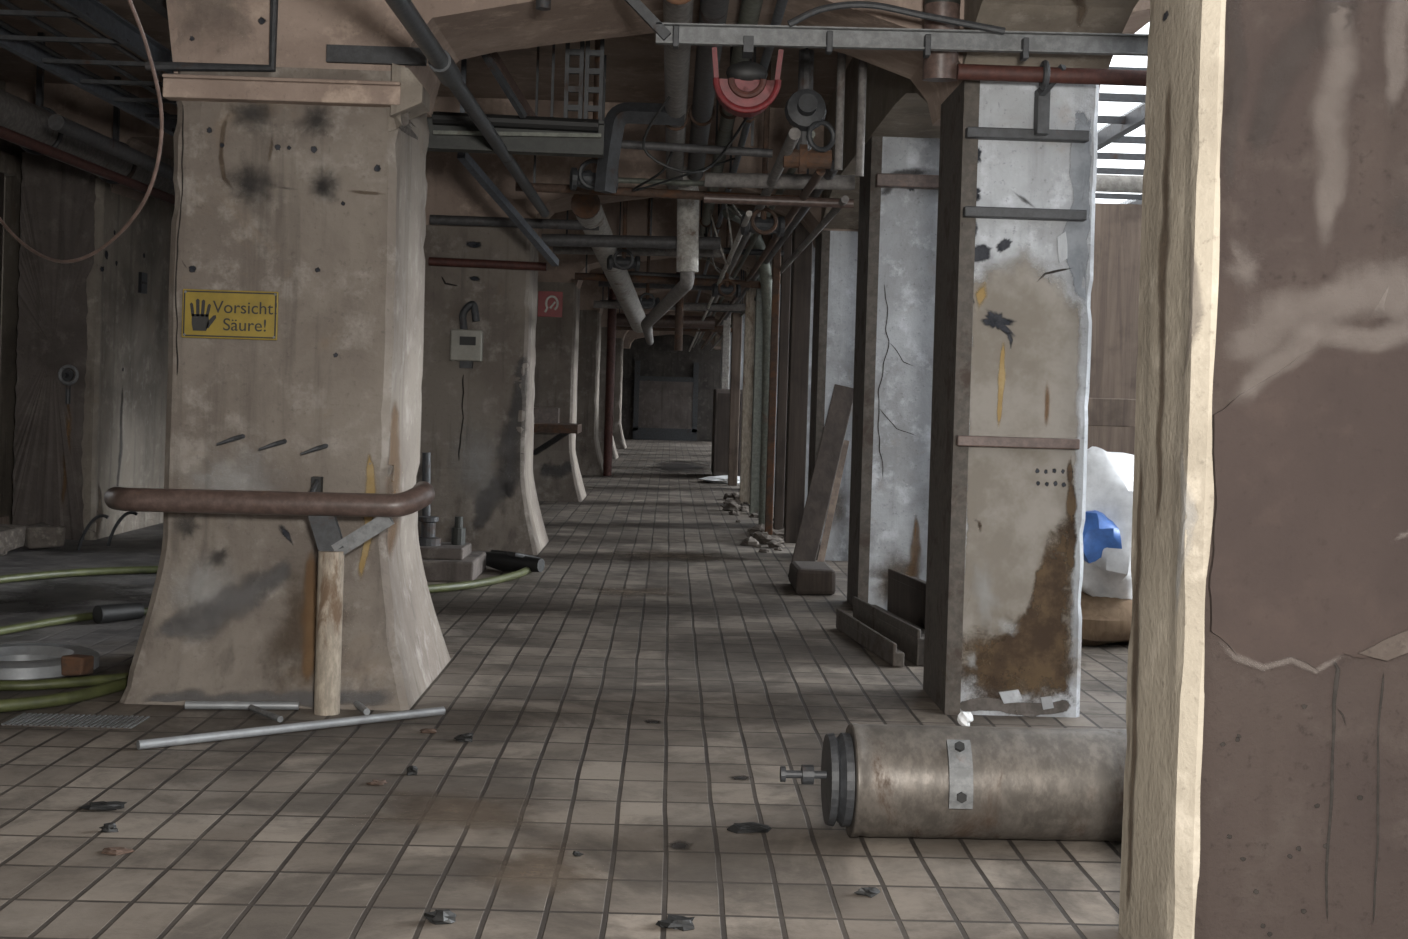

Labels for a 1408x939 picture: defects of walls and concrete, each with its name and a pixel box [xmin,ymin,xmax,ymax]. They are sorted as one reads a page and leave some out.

flaking render [1208,339,1408,671]